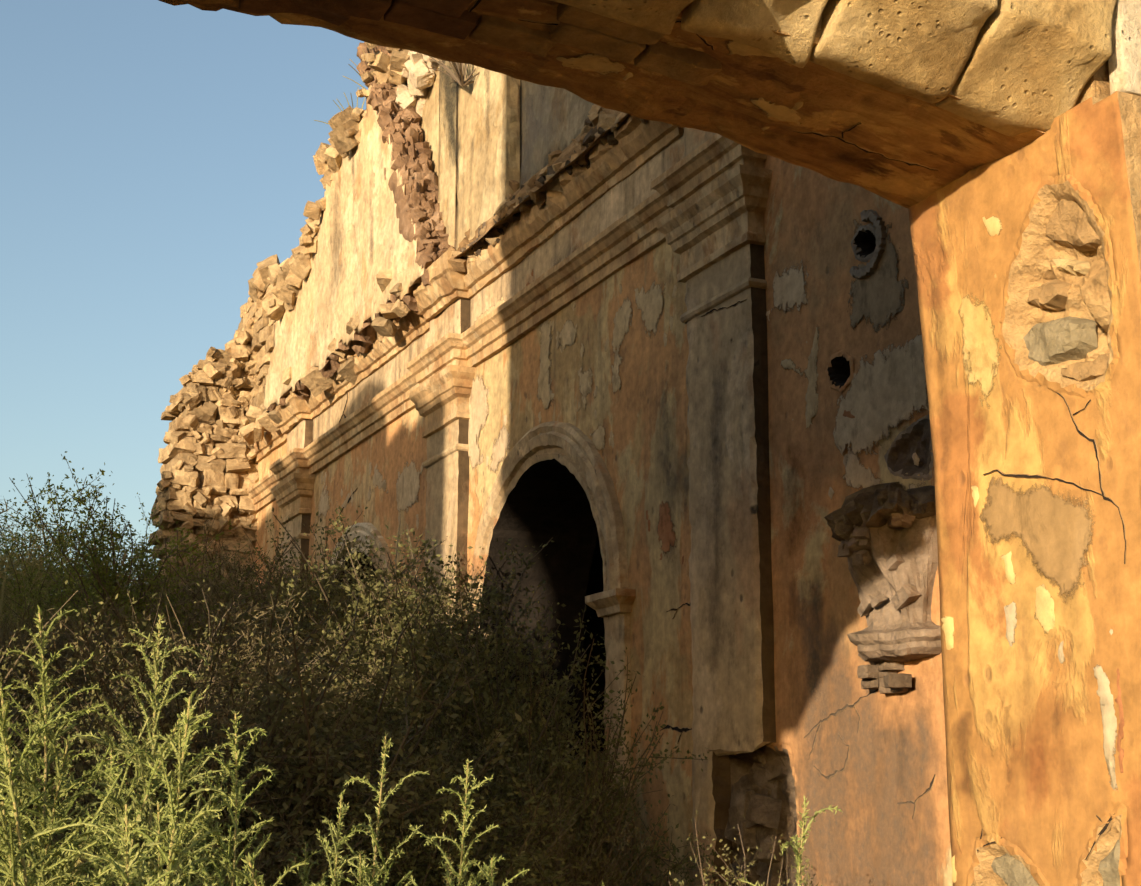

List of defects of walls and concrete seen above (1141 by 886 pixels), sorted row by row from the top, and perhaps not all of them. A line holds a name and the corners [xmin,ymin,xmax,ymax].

peeling [750,97,804,131]
peeling [766,260,809,320]
spalling [958,174,1119,407]
peeling [833,334,933,490]
peeling [396,461,423,530]
peeling [971,469,1094,634]
crack [1047,391,1127,564]
peeling [1004,601,1017,646]
peeling [1093,665,1124,791]
spalling [724,743,805,886]
spalling [951,833,1051,886]
spalling [1073,804,1128,886]